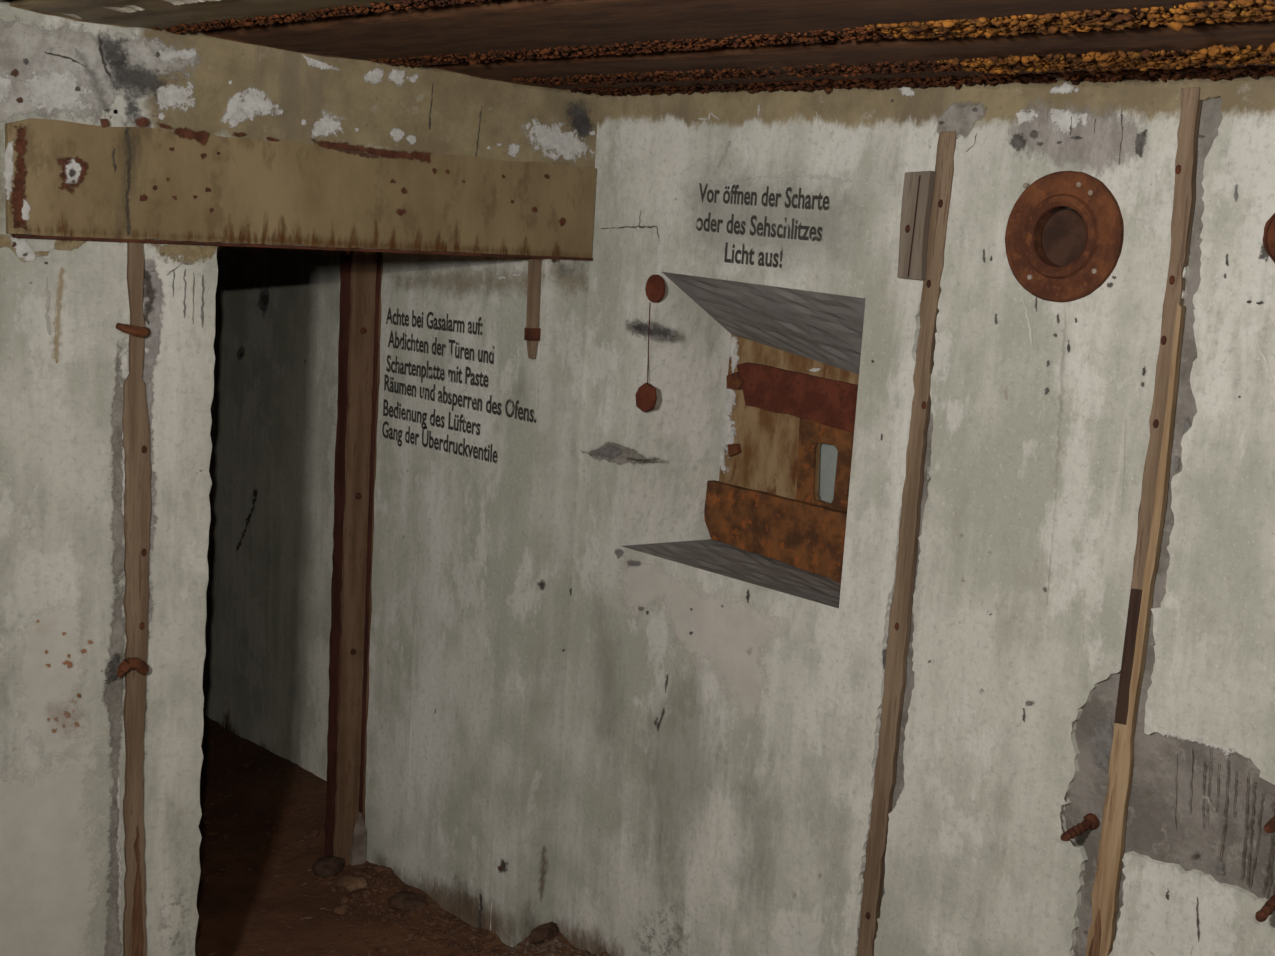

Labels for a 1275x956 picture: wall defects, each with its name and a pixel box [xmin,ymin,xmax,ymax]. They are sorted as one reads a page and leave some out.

rust [152,0,492,34]
rust [369,0,1275,67]
rust [512,42,1275,96]
peeling [220,80,283,128]
peeling [487,119,595,163]
peeling [1009,82,1147,172]
spalling [1112,97,1275,950]
rust [47,694,81,733]
spalling [1060,672,1120,956]